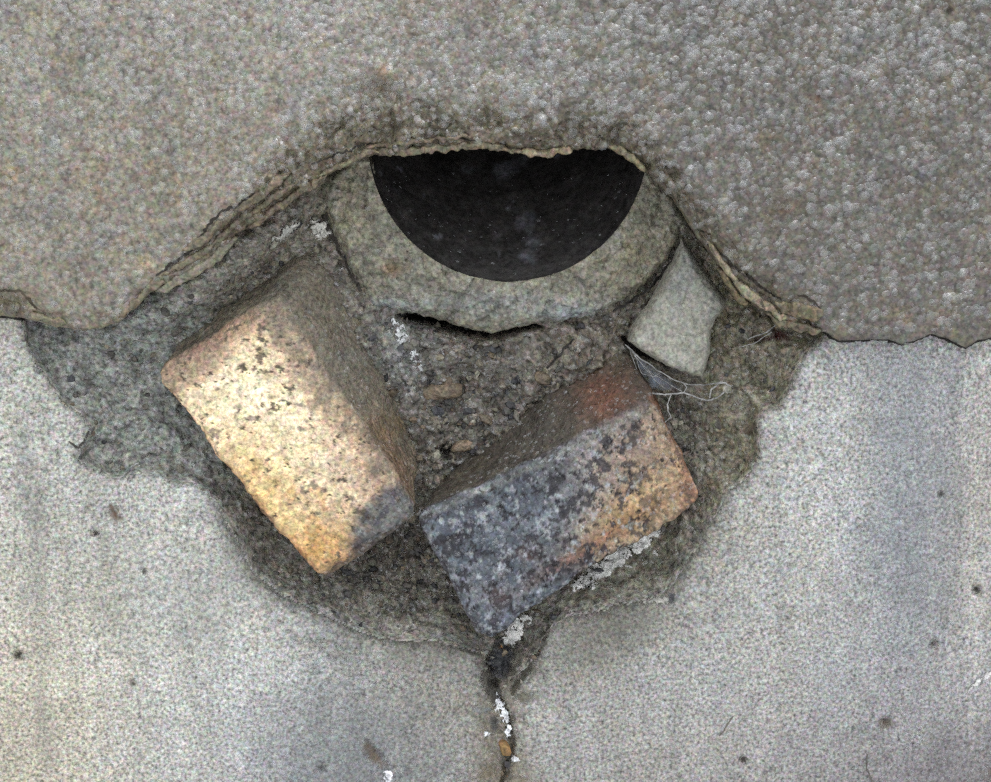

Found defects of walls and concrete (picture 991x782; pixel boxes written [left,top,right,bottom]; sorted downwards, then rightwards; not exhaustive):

spalling [21,132,827,680]
efflorescence [568,531,661,592]
crack [457,623,550,782]